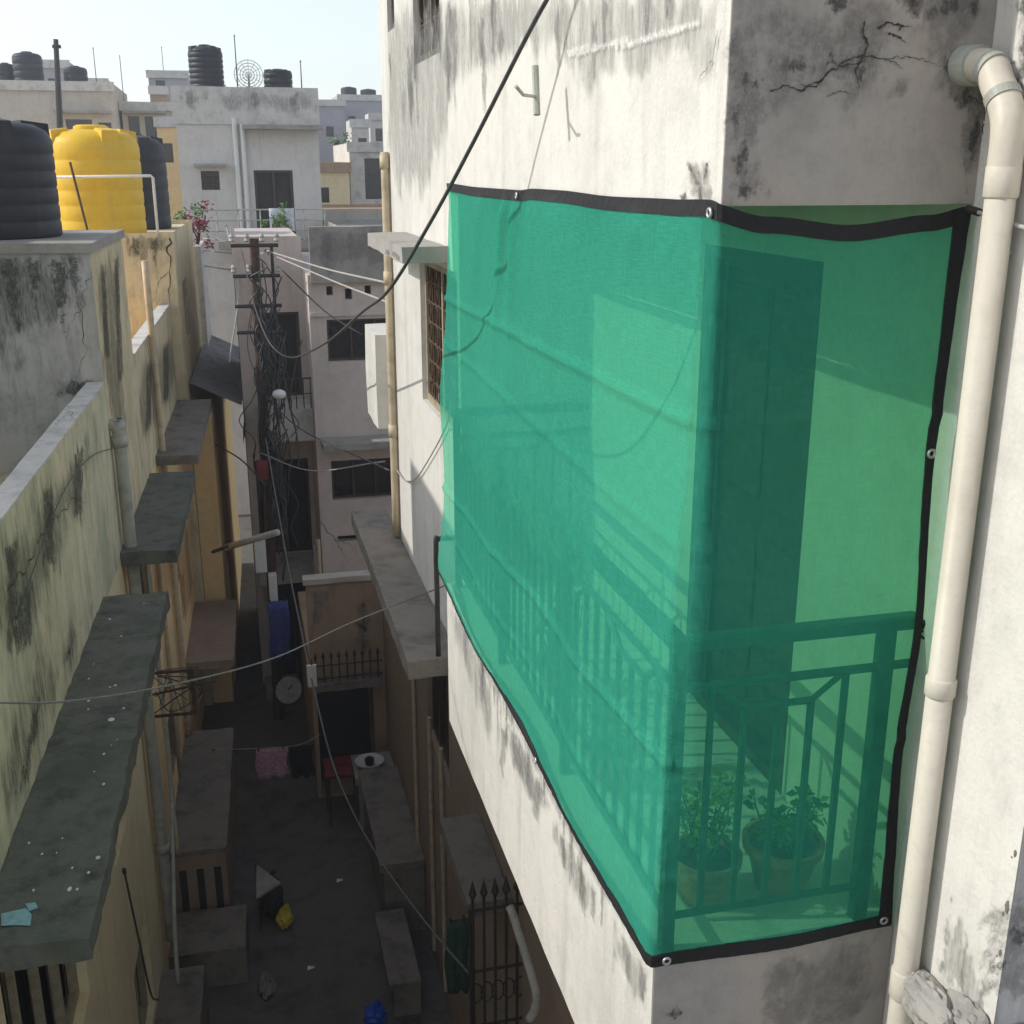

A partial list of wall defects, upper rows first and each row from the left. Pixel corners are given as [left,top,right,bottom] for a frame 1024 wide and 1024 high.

water stain [829,0,846,12]
water stain [389,0,539,182]
crack [770,21,946,96]
water stain [945,65,984,169]
water stain [0,257,79,346]
water stain [99,259,126,426]
water stain [140,342,174,432]
water stain [0,448,86,655]
water stain [4,657,54,807]
water stain [940,907,1024,1005]